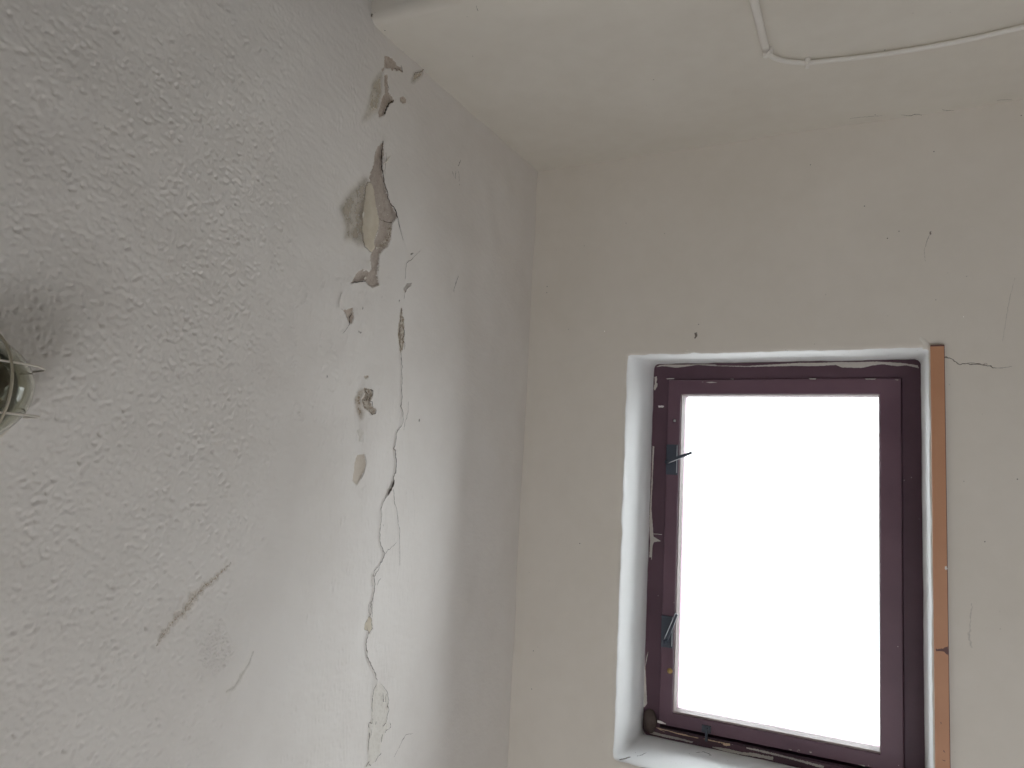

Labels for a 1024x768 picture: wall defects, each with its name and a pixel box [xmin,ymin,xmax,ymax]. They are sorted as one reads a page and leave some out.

spalling [378,56,406,117]
spalling [351,143,397,287]
spalling [339,293,354,333]
spalling [362,375,376,415]
spalling [352,454,367,484]
crack [366,357,409,679]